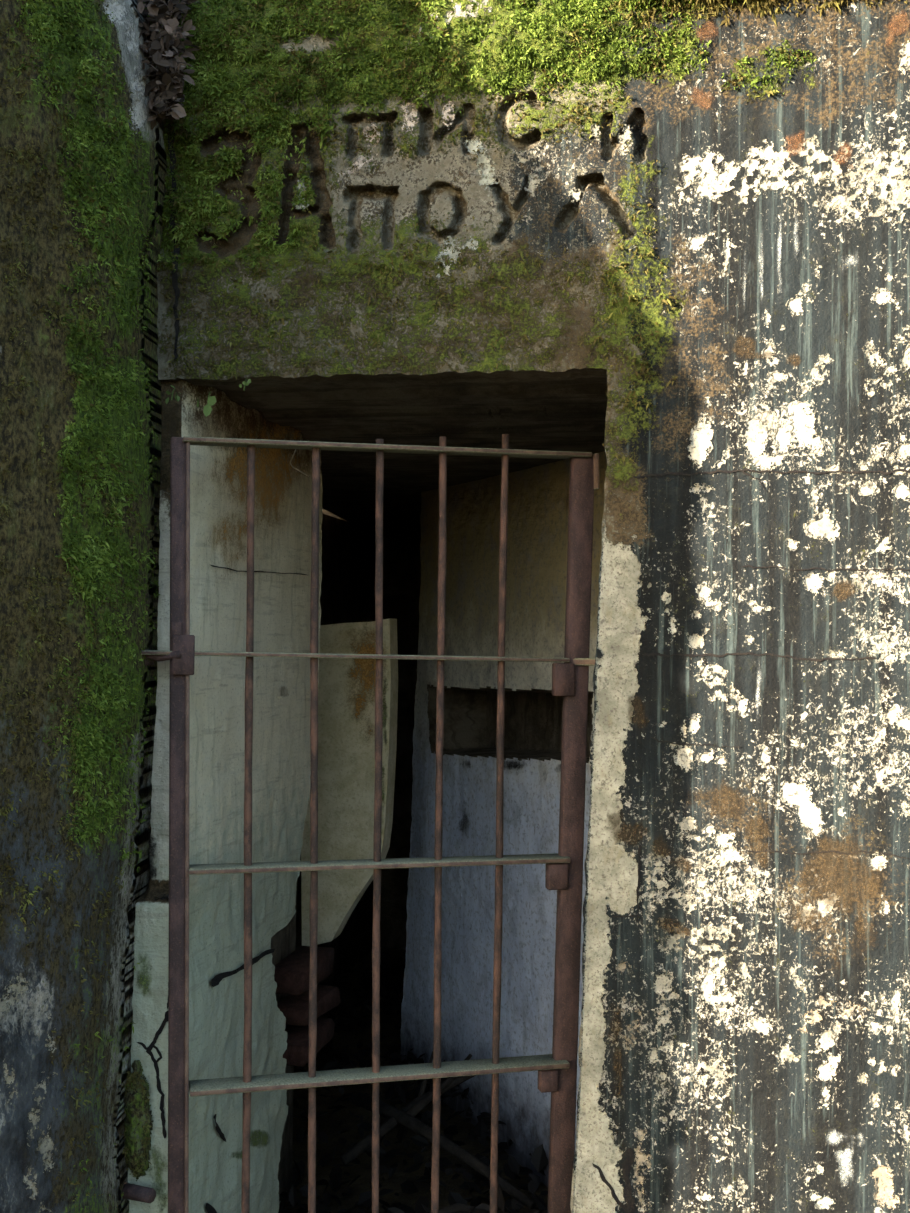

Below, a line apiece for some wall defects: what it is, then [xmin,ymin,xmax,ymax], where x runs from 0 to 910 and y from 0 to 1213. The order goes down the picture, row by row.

peeling [676,134,910,224]
peeling [687,266,910,551]
peeling [754,746,825,836]
peeling [824,697,910,819]
water stain [608,812,690,872]
peeling [572,519,778,1213]
water stain [801,838,880,935]
crack [211,949,275,987]
crack [137,981,169,1138]
peeling [777,966,901,1110]
crack [214,1114,226,1142]
peeling [870,1165,900,1210]